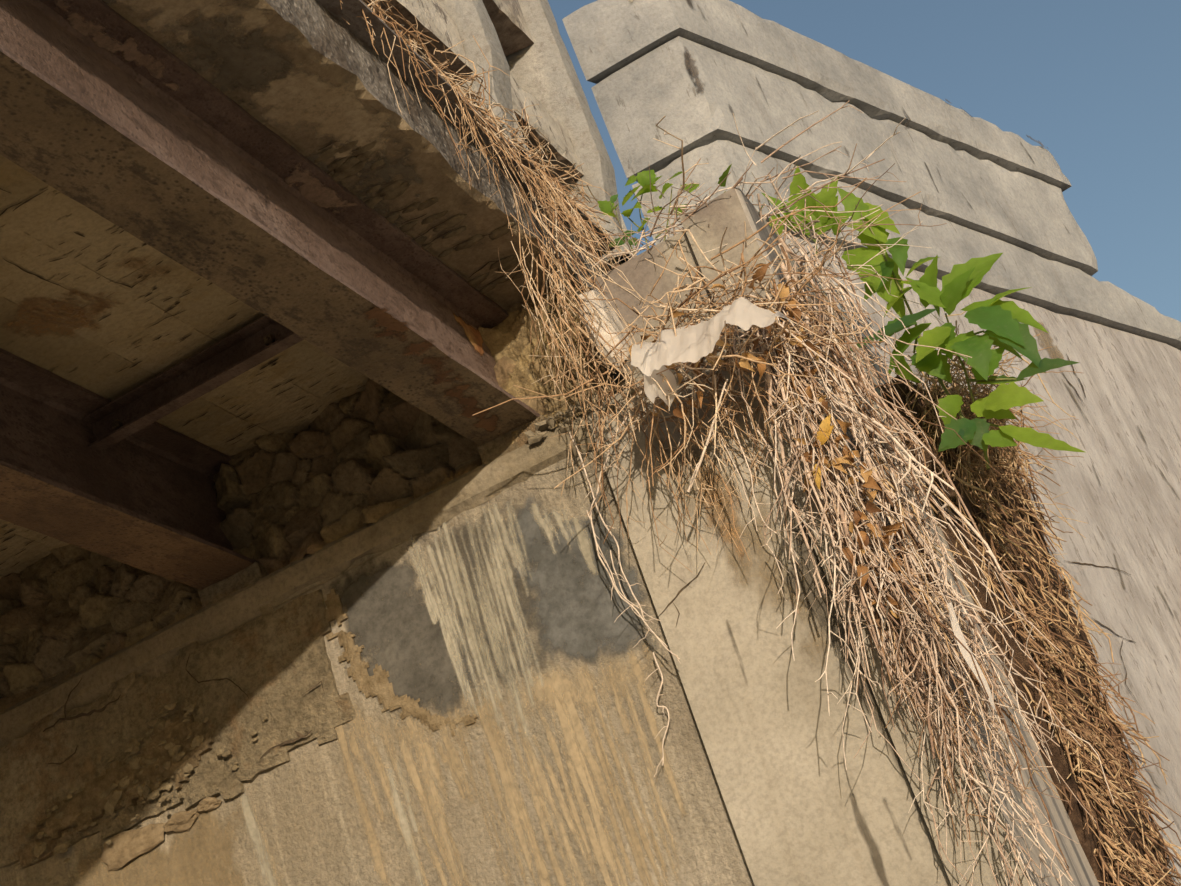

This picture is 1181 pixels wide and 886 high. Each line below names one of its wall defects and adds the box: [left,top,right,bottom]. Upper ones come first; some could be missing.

peeling [56,0,179,90]
peeling [119,0,271,41]
crack [43,678,121,765]
spalling [21,697,239,871]
crack [260,730,312,759]
peeling [325,589,479,736]
water stain [332,495,685,886]